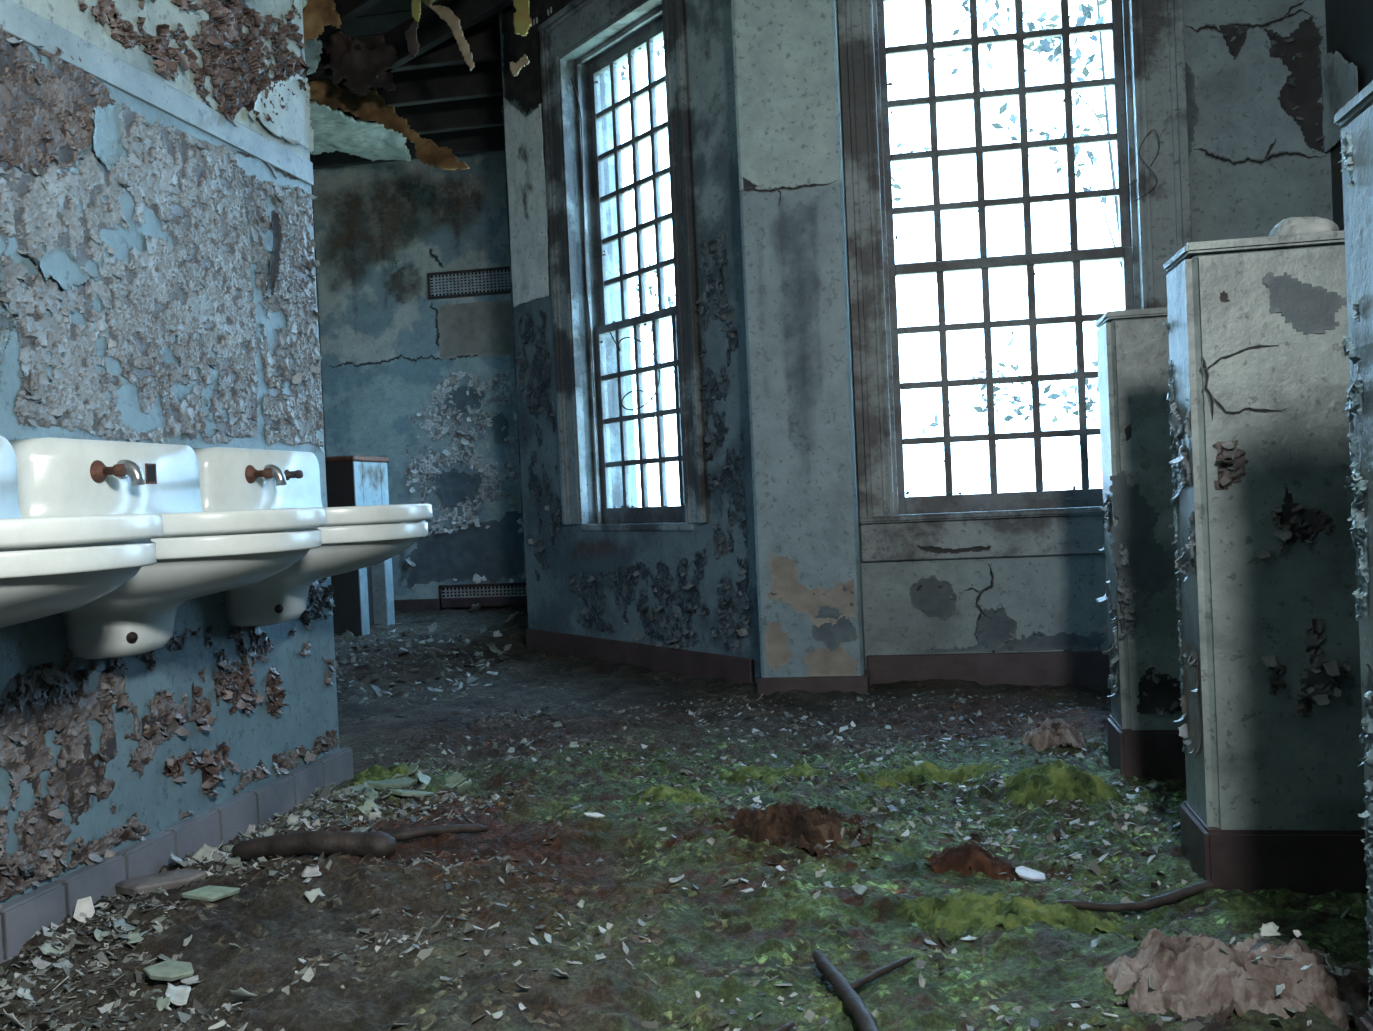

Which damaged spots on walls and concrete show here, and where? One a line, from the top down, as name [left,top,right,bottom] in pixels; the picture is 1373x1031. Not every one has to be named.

crack [1185,0,1318,34]
peeling [0,24,325,454]
peeling [79,0,314,152]
leakage [325,175,482,290]
leakage [389,267,420,301]
crack [326,301,509,368]
crack [739,180,837,207]
crack [1194,138,1325,167]
peeling [1219,15,1355,193]
crack [963,566,994,643]
peeling [917,357,1201,757]
peeling [0,626,340,908]